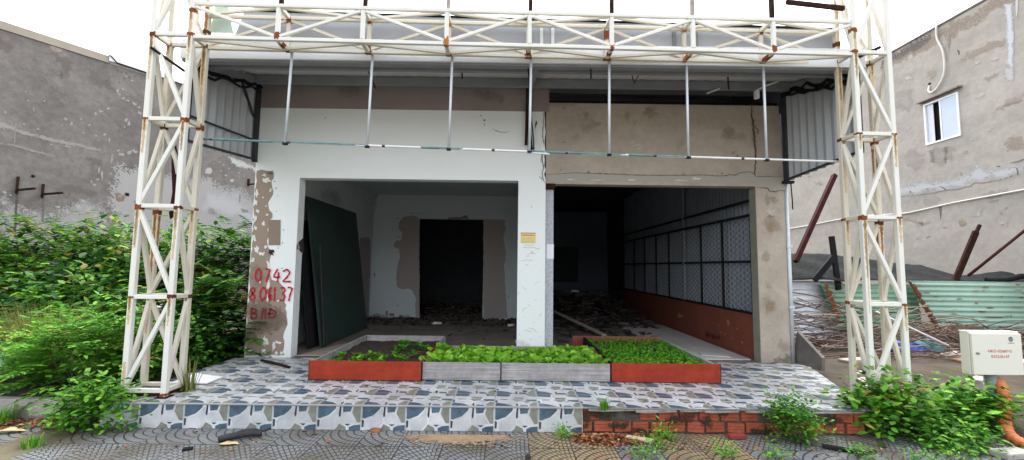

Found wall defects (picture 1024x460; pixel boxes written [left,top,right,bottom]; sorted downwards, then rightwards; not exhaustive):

corrosion [148,7,211,108]
corrosion [602,30,615,61]
corrosion [832,10,875,118]
corrosion [141,117,213,158]
crack [539,104,785,192]
corrosion [837,132,880,181]
corrosion [133,204,199,272]
flaking render [201,156,288,356]
flaking render [386,216,420,318]
flaking render [483,219,536,323]
corrosion [841,215,884,312]